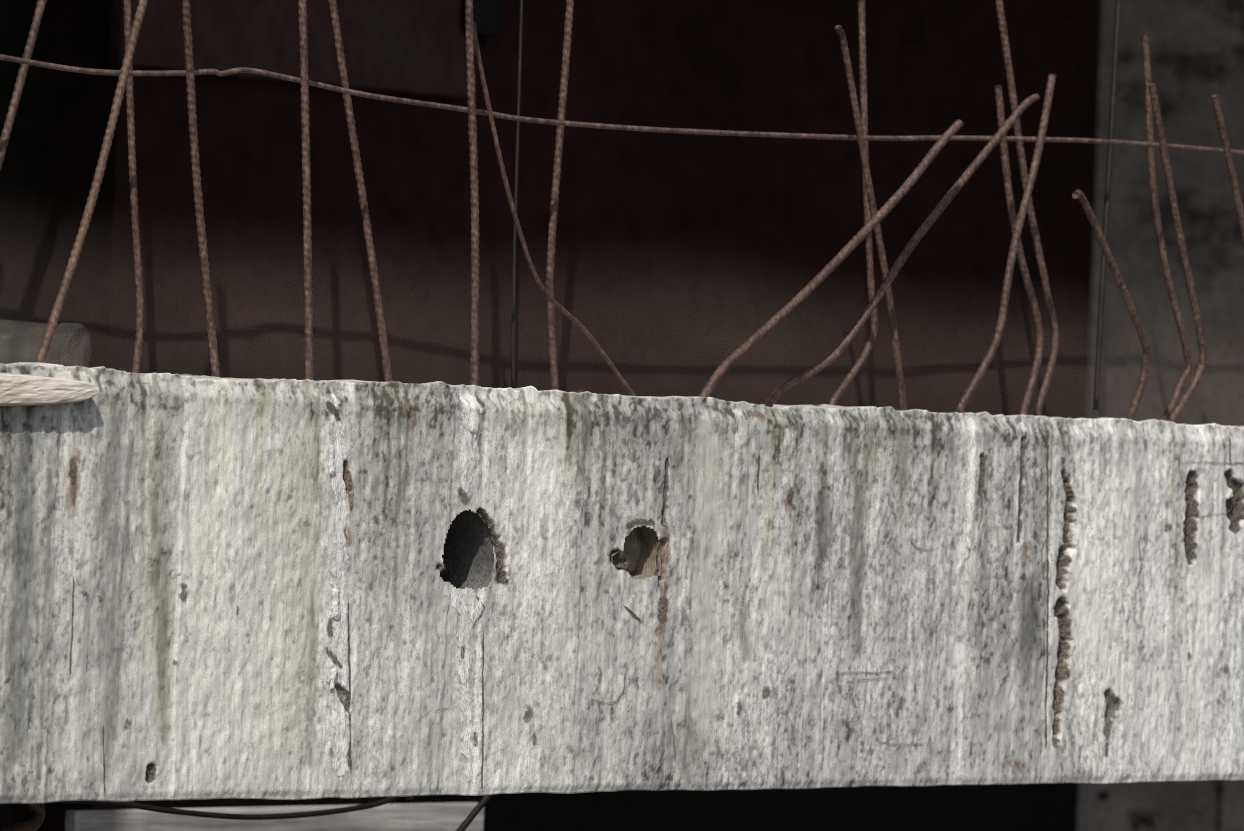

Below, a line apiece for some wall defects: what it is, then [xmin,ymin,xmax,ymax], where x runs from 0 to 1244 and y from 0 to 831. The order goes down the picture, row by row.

rust [67,457,78,516]
spalling [477,508,508,583]
spalling [609,550,630,569]
spalling [626,518,655,528]
rust [656,457,669,687]
spalling [444,590,486,622]